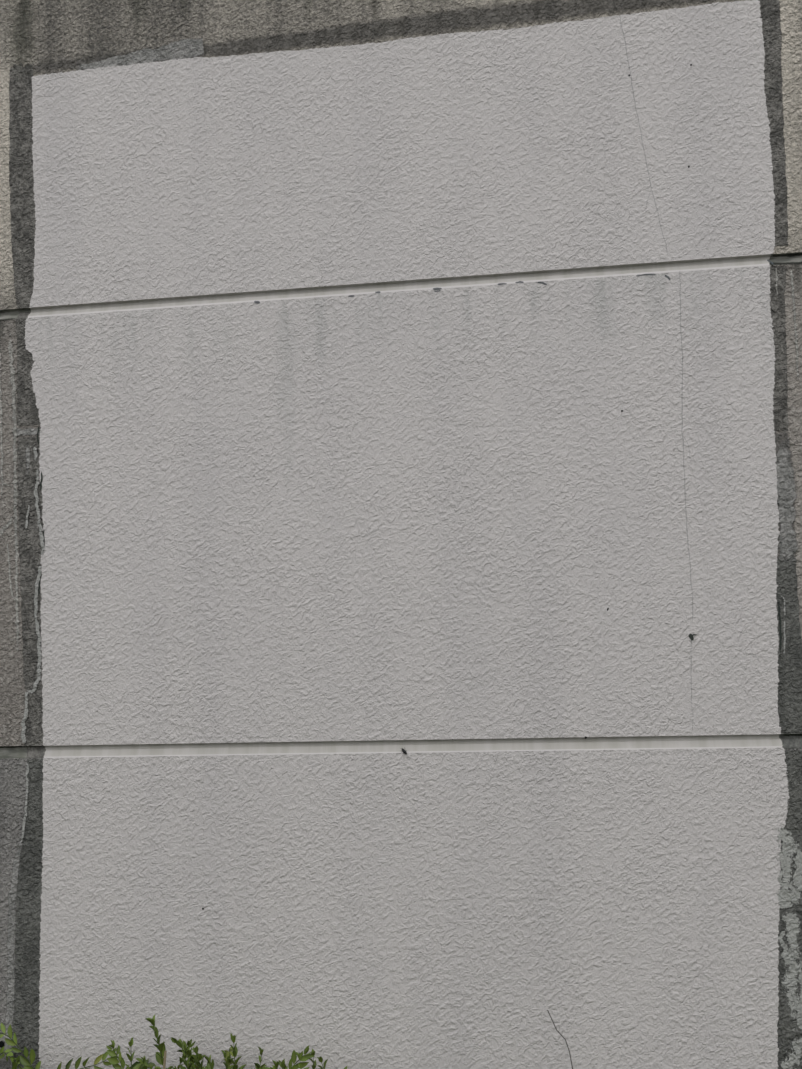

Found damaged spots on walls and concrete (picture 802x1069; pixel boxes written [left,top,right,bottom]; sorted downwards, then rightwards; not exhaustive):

leakage [0,312,45,1069]
leakage [9,0,707,309]
leakage [758,0,802,749]
peeling [775,750,802,1069]